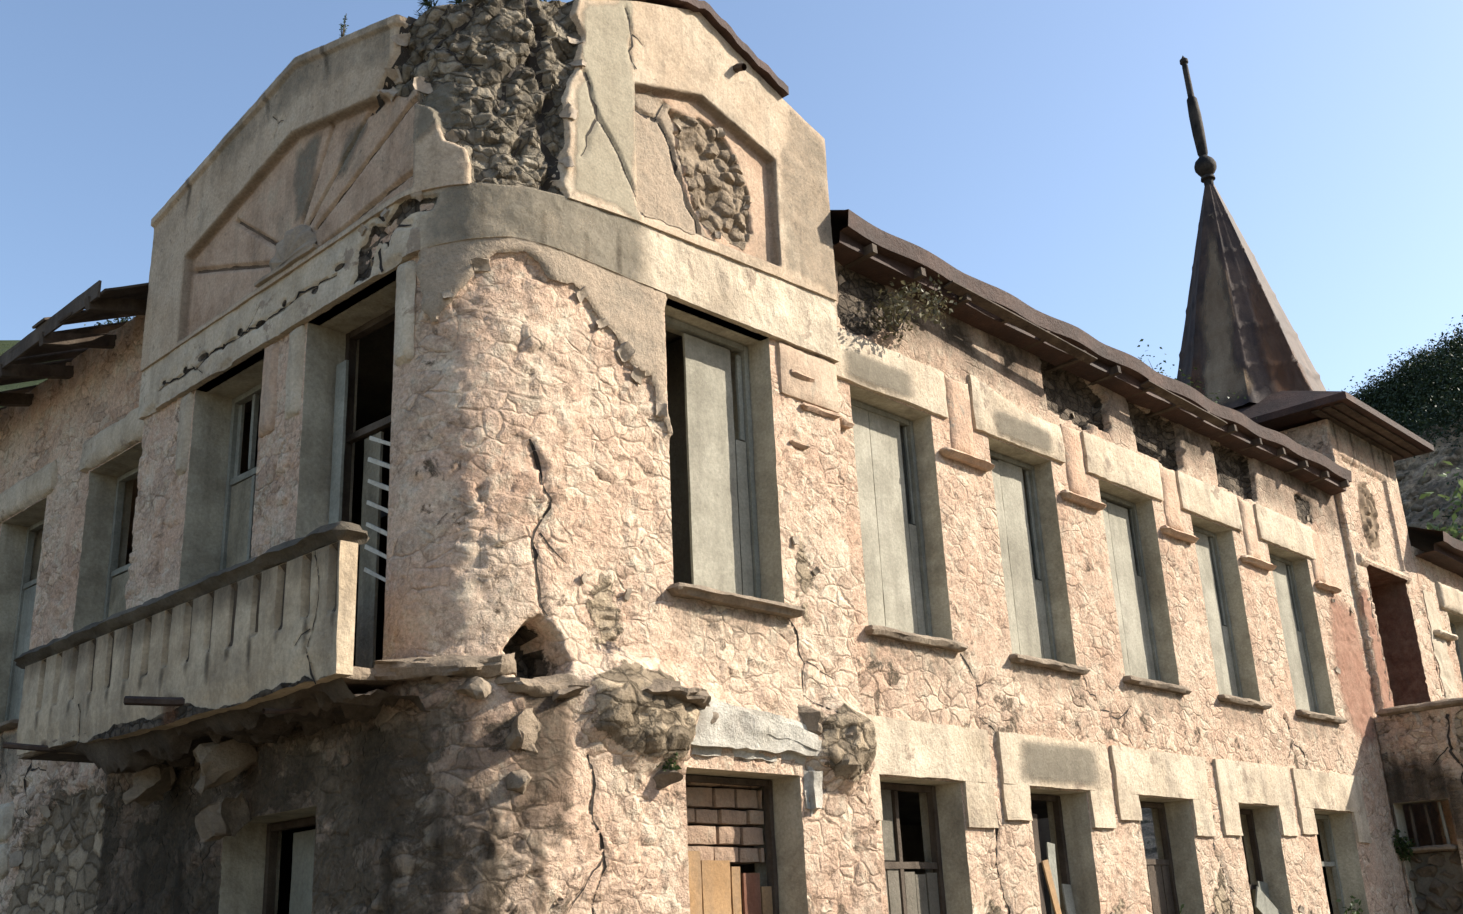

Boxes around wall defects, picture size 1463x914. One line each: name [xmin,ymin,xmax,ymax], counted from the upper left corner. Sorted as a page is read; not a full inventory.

crack [376,0,645,217]
flaking render [377,0,721,241]
crack [635,104,697,234]
peeling [183,320,266,374]
crack [528,439,567,616]
flaking render [62,676,326,745]
crack [1433,714,1463,784]
crack [569,754,607,914]